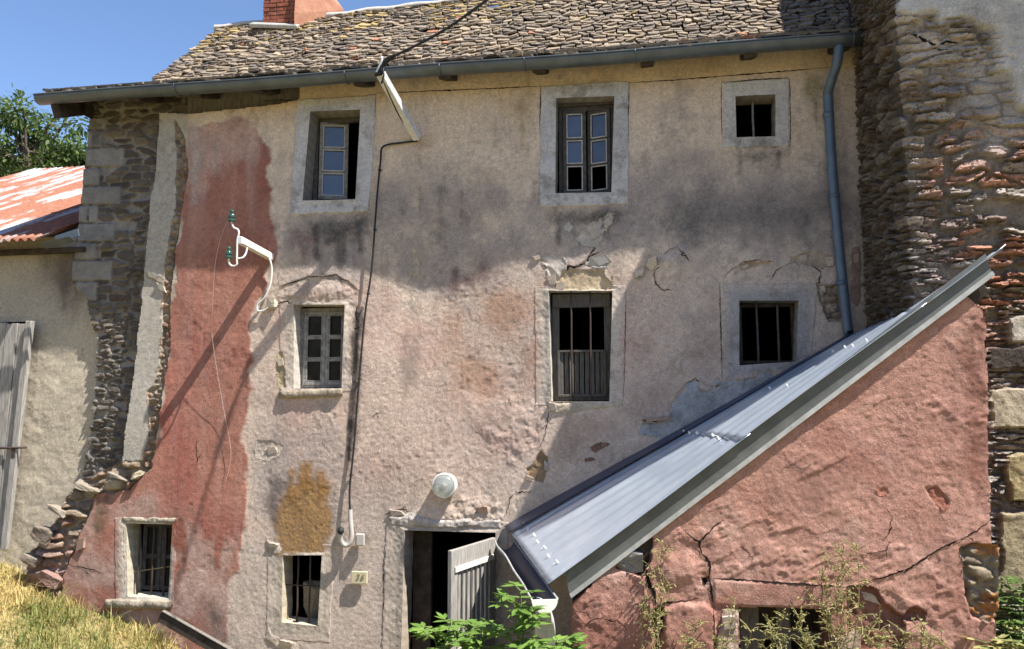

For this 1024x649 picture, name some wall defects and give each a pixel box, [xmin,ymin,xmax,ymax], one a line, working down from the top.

crack [905,34,957,51]
damp [310,215,366,266]
flaking render [532,212,615,290]
crack [653,247,690,291]
crack [276,273,361,329]
crack [689,259,824,387]
flaking render [637,372,774,440]
flaking render [525,451,549,482]
flaking render [929,487,949,512]
crack [644,508,990,649]
flaking render [845,585,927,649]